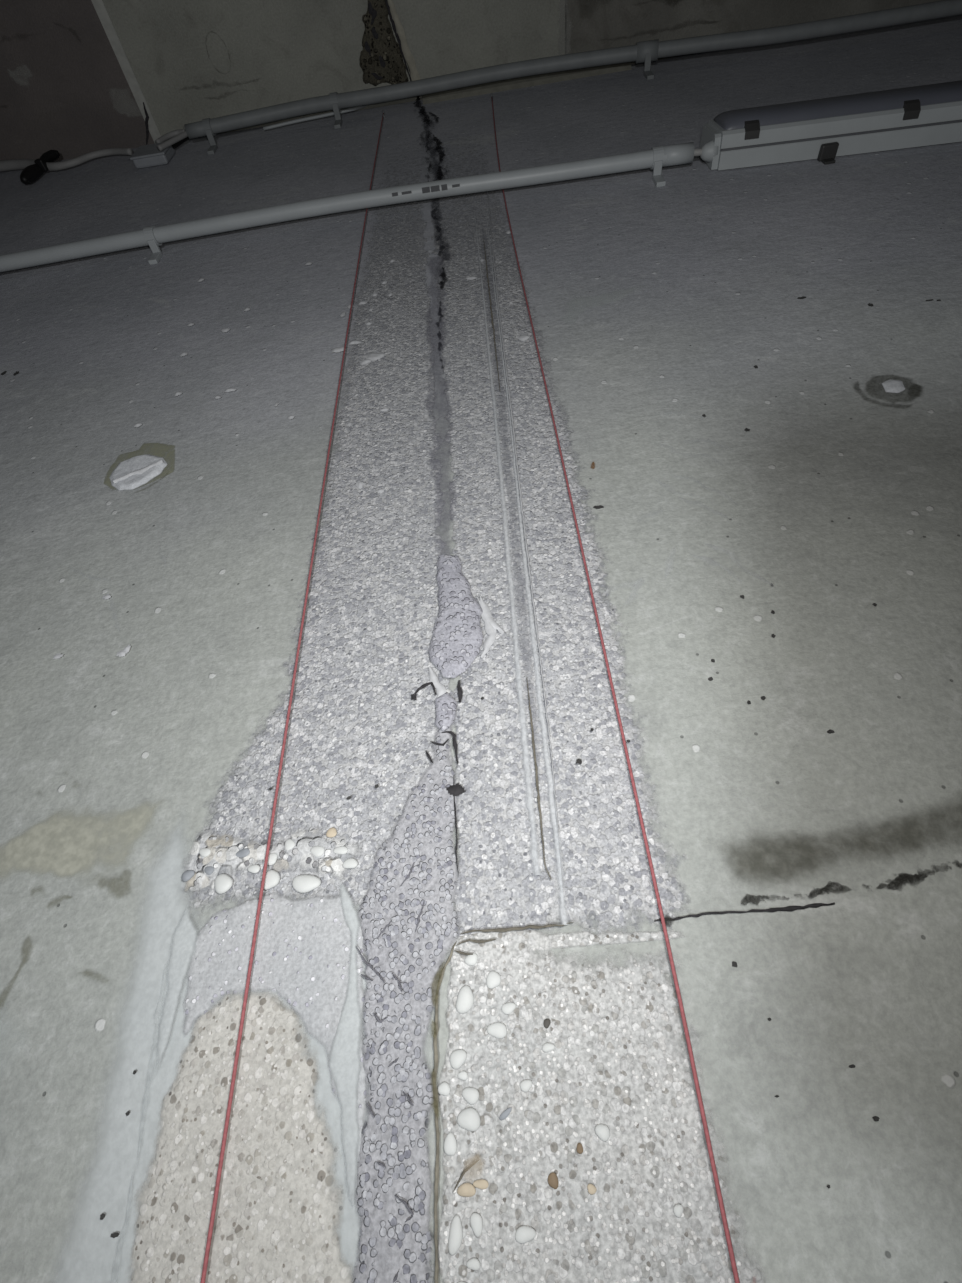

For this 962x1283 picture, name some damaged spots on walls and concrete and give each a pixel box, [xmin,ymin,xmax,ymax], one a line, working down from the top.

spalling [157,190,764,1283]
crack [878,873,927,890]
crack [654,882,847,926]